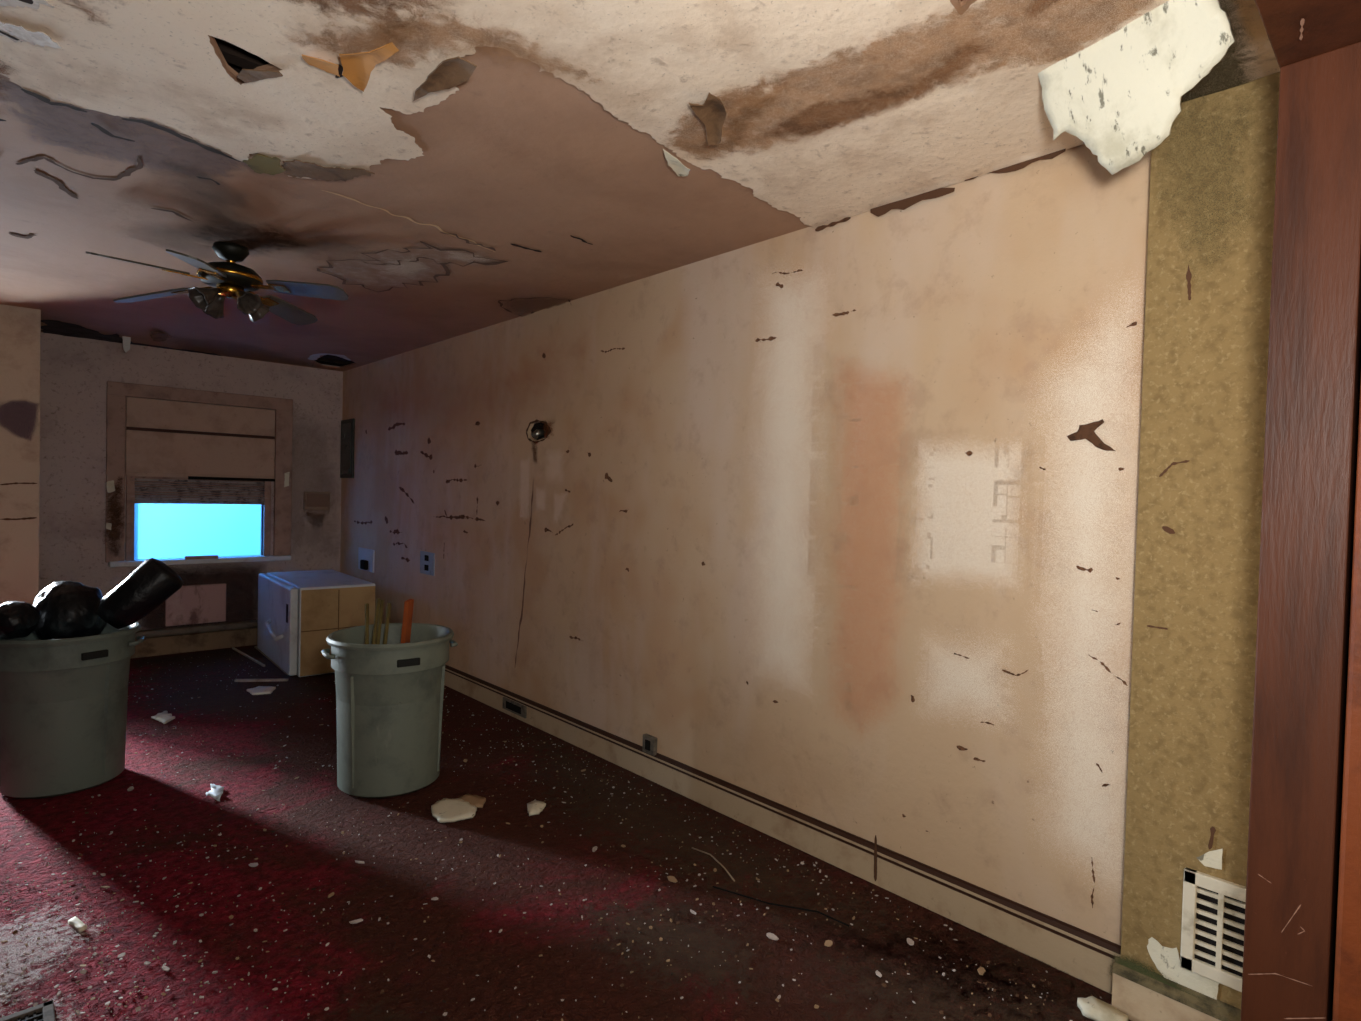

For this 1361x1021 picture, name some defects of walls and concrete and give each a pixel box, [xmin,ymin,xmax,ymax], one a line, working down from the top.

water stain [284,0,603,87]
peeling [0,0,1169,231]
water stain [661,0,1169,162]
peeling [1183,0,1280,101]
peeling [122,336,131,352]
peeling [1197,826,1223,870]